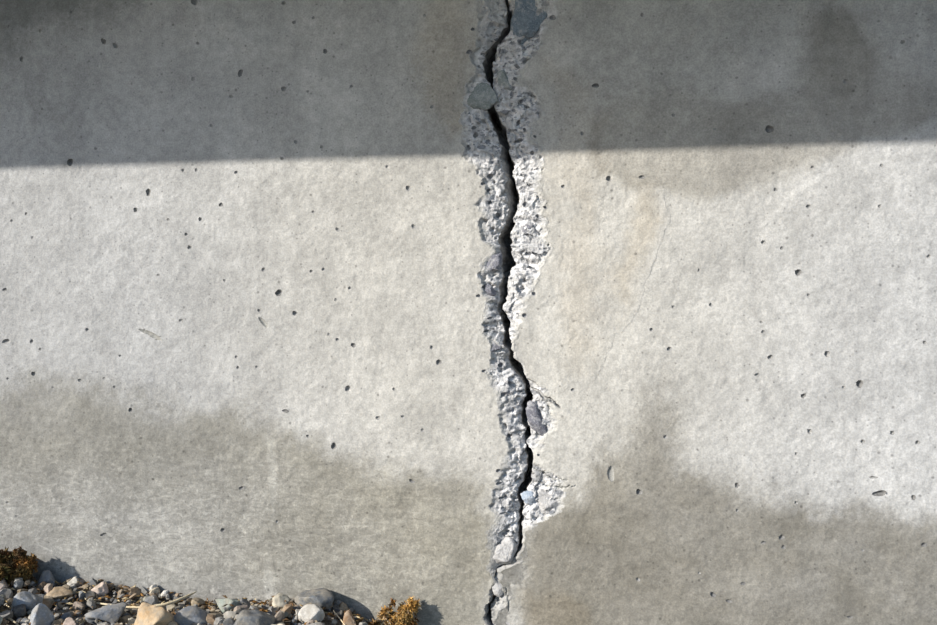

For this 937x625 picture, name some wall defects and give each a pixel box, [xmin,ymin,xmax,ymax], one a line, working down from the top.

water stain [0,353,937,625]
spalling [458,0,566,625]
crack [482,0,575,625]
water stain [547,0,937,210]